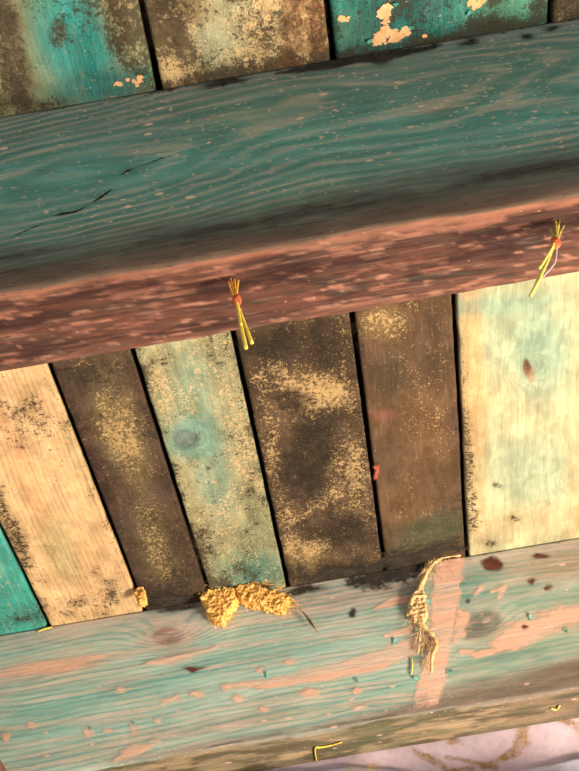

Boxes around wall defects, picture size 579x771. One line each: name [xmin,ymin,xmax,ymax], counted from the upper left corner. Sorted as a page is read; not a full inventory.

water stain [239,0,324,67]
peeling [367,2,415,46]
peeling [467,0,486,17]
crack [54,155,171,216]
peeling [222,558,579,707]
peeling [0,655,107,676]
peeling [146,646,218,665]
peeling [116,741,158,760]